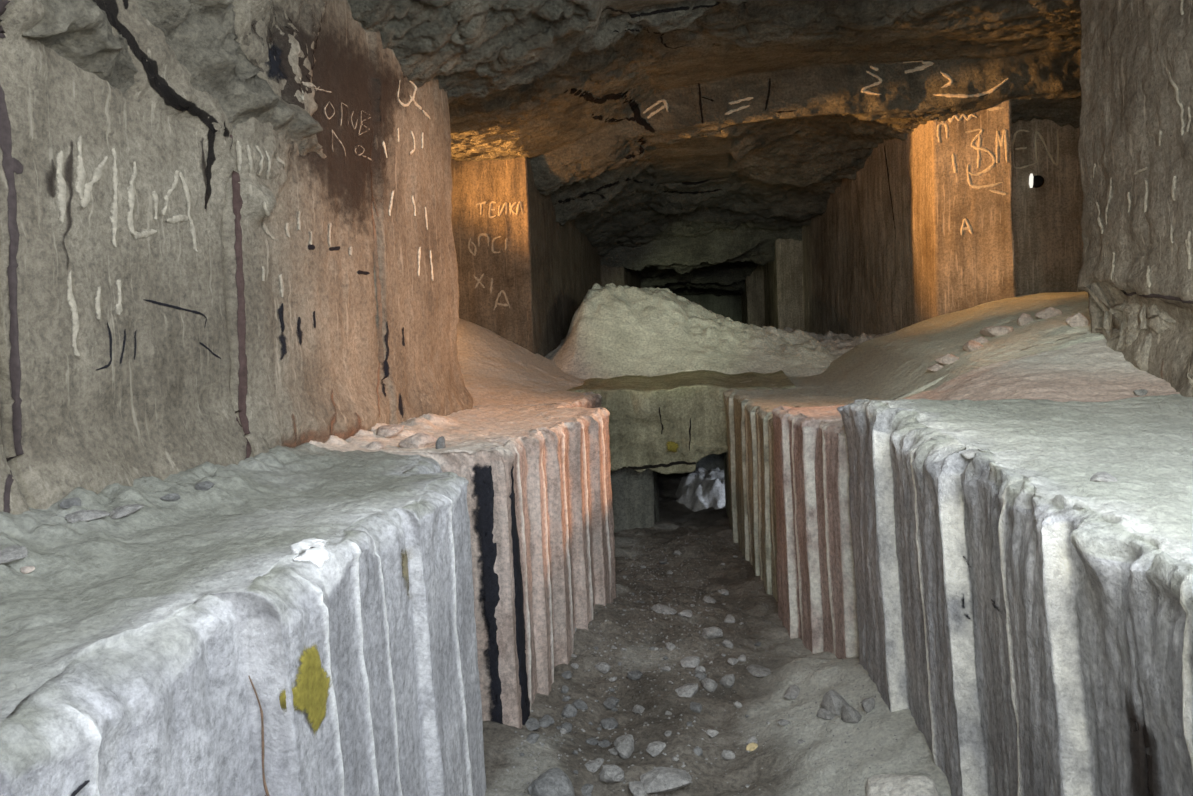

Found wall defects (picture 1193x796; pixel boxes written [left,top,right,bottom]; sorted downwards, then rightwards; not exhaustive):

crack [0,0,10,39]
crack [0,85,24,513]
crack [93,0,251,459]